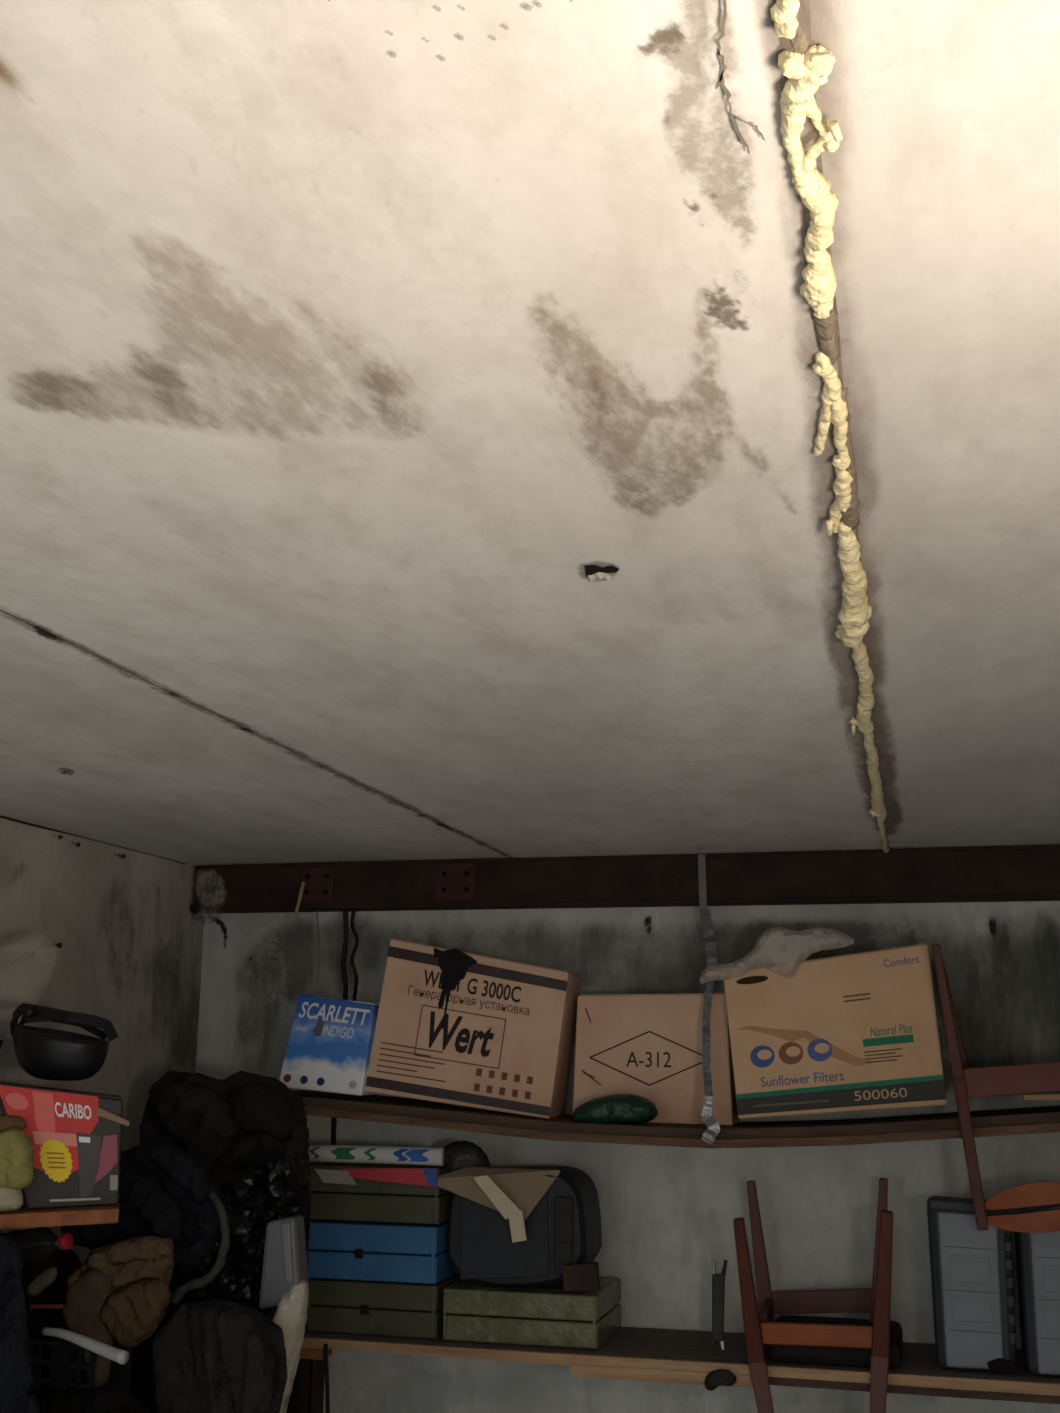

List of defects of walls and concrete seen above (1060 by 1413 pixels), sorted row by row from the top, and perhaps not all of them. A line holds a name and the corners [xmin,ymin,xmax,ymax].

water stain [701,14,721,82]
crack [716,0,766,154]
water stain [769,0,830,49]
water stain [813,82,829,115]
water stain [804,343,824,389]
water stain [814,420,900,835]